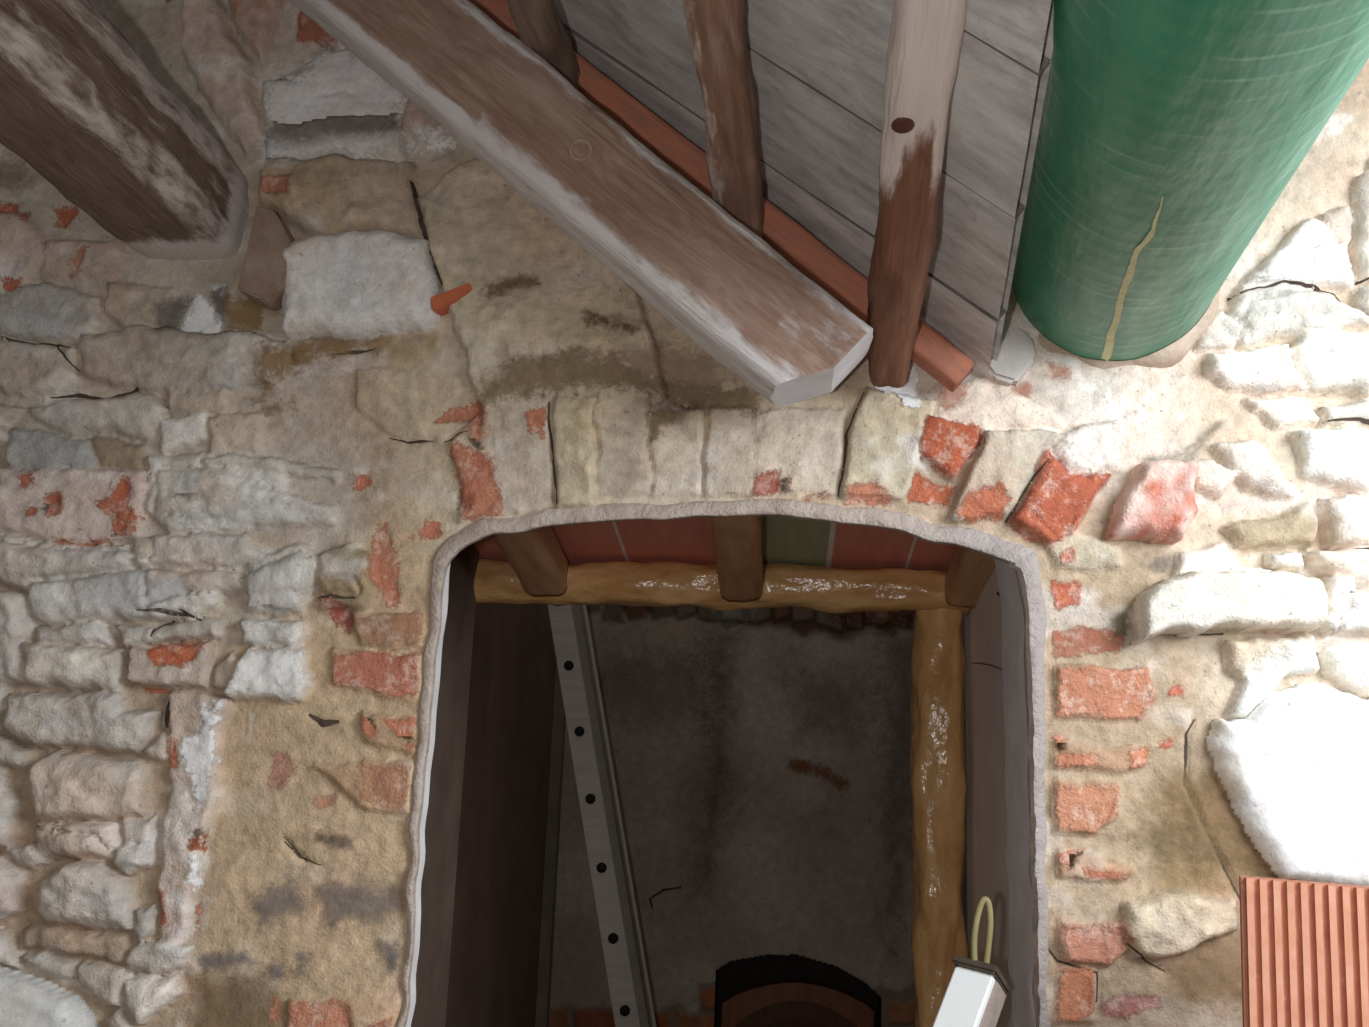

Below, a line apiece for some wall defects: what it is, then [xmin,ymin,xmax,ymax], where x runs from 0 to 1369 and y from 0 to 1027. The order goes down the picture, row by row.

crack [409,180,442,285]
damp [487,276,540,297]
damp [582,311,637,334]
crack [1227,277,1369,302]
damp [481,346,763,441]
crack [838,392,864,497]
crack [971,562,1098,1027]
crack [1184,719,1240,899]
crack [1127,943,1165,972]